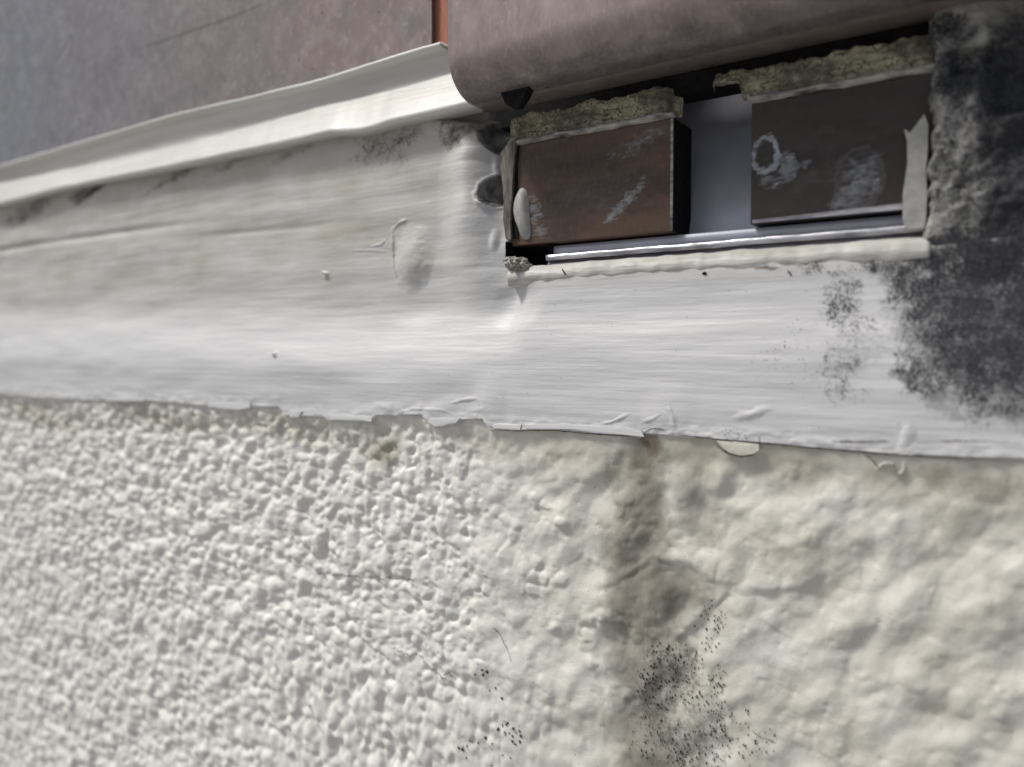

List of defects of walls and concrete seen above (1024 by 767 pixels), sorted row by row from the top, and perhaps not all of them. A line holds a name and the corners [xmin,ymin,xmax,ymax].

damp [865,11,1024,424]
damp [806,262,871,328]
peeling [326,414,373,422]
peeling [429,417,460,426]
peeling [492,423,644,437]
peeling [717,441,759,455]
damp [611,439,776,767]